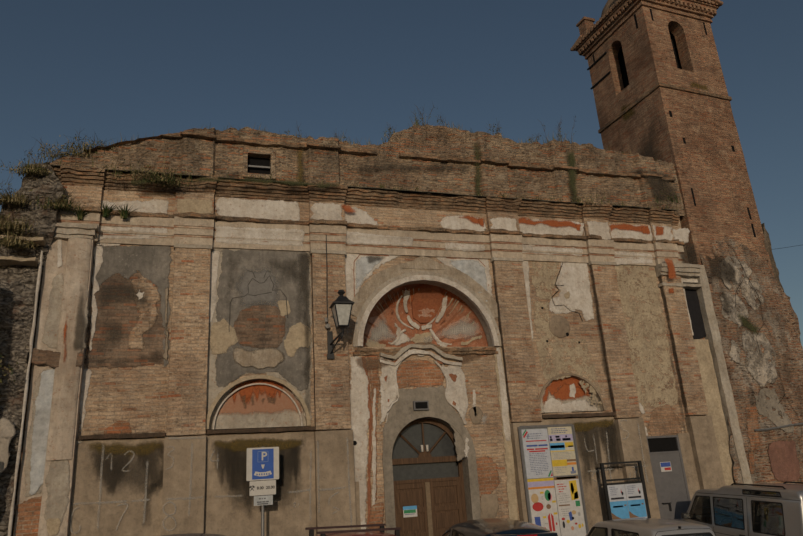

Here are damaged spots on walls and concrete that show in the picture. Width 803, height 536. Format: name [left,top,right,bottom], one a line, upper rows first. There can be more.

flaking render [0,417,16,475]
flaking render [15,239,70,536]
flaking render [76,226,172,430]
water stain [95,445,163,505]
flaking render [101,197,413,420]
water stain [216,446,299,501]
flaking render [350,323,477,532]
flaking render [436,242,493,302]
flaking render [522,244,602,414]
flaking render [440,215,690,243]
flaking render [614,252,682,436]